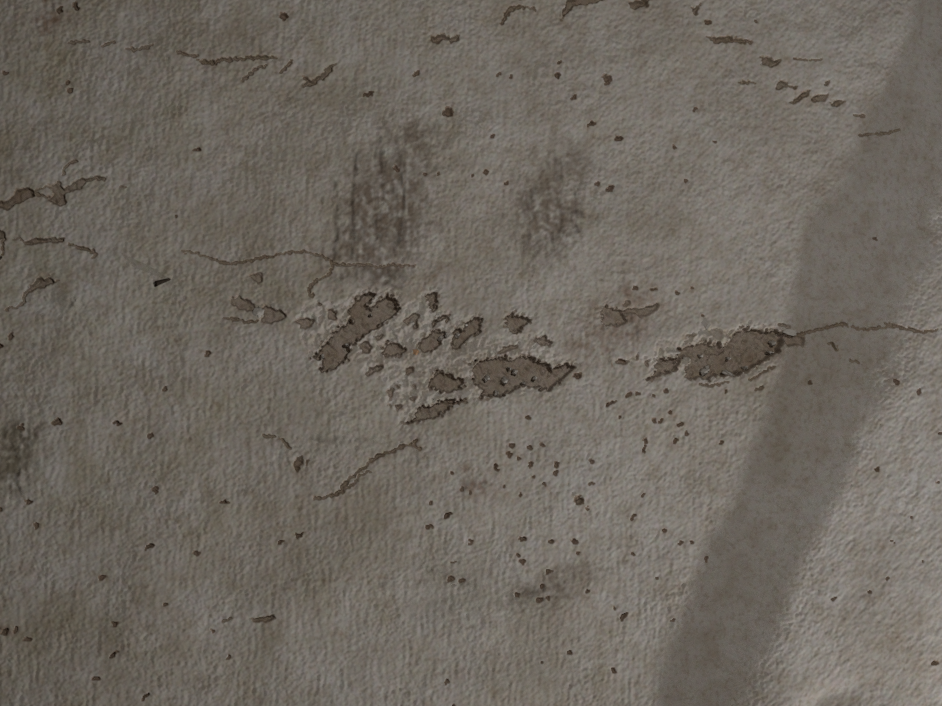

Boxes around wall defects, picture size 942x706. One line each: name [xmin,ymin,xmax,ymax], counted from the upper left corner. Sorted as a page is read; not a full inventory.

crack [0,158,127,259]
crack [181,249,416,298]
flaking render [599,285,659,327]
flaking render [223,287,582,425]
flaking render [605,314,806,407]
crack [794,322,942,364]
crack [262,433,310,473]
crack [313,439,422,501]